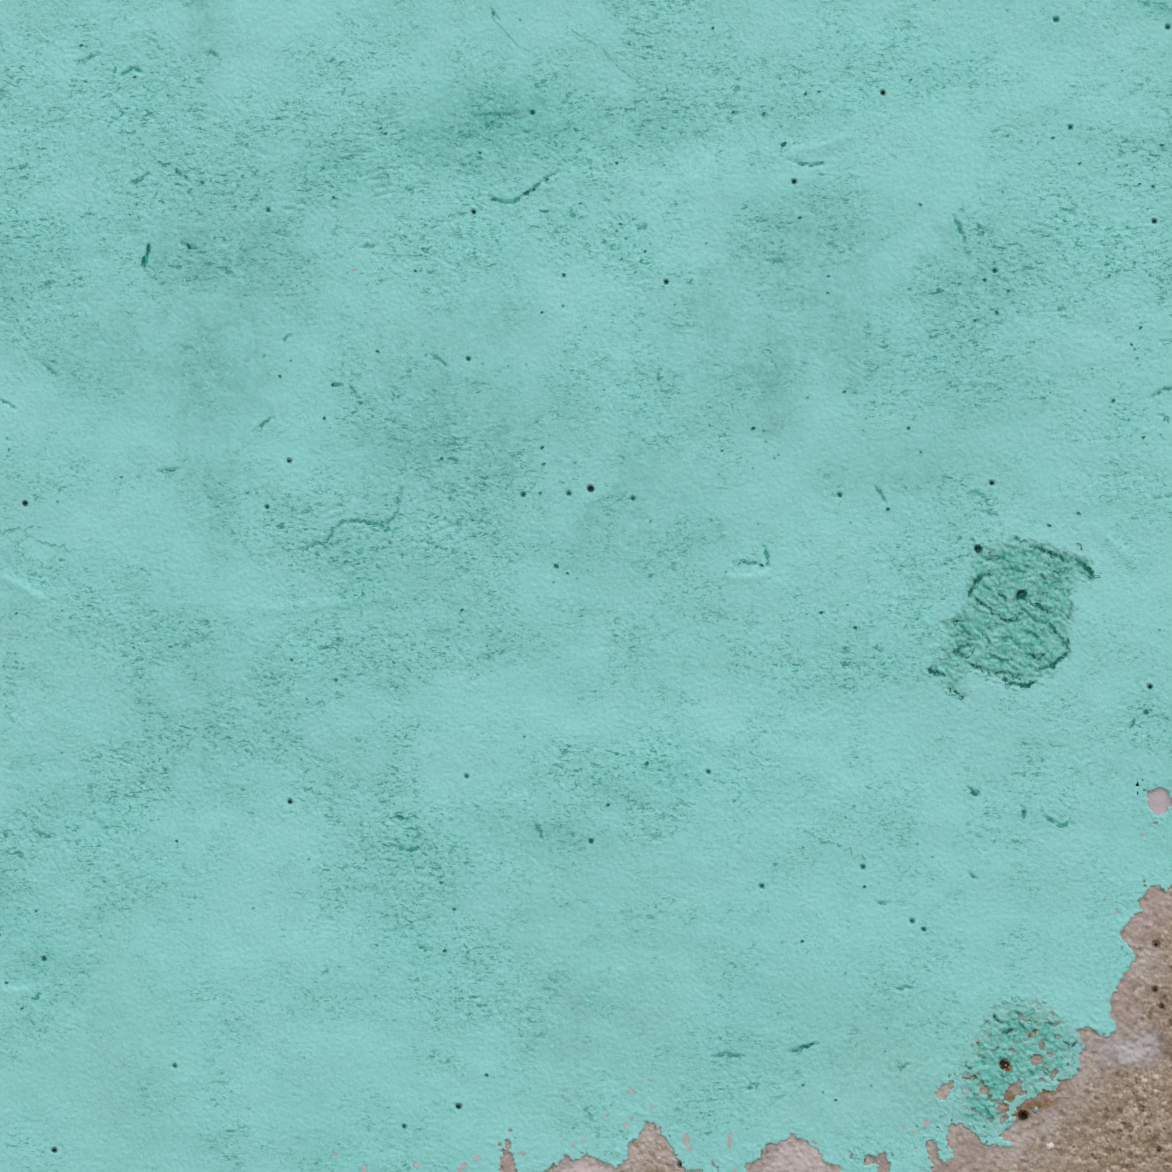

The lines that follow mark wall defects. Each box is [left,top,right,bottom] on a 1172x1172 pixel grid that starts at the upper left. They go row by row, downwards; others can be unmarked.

peeling [1143,787,1172,825]
peeling [902,874,1172,1172]
peeling [498,1129,528,1172]
peeling [544,1106,719,1172]
peeling [733,1133,894,1172]